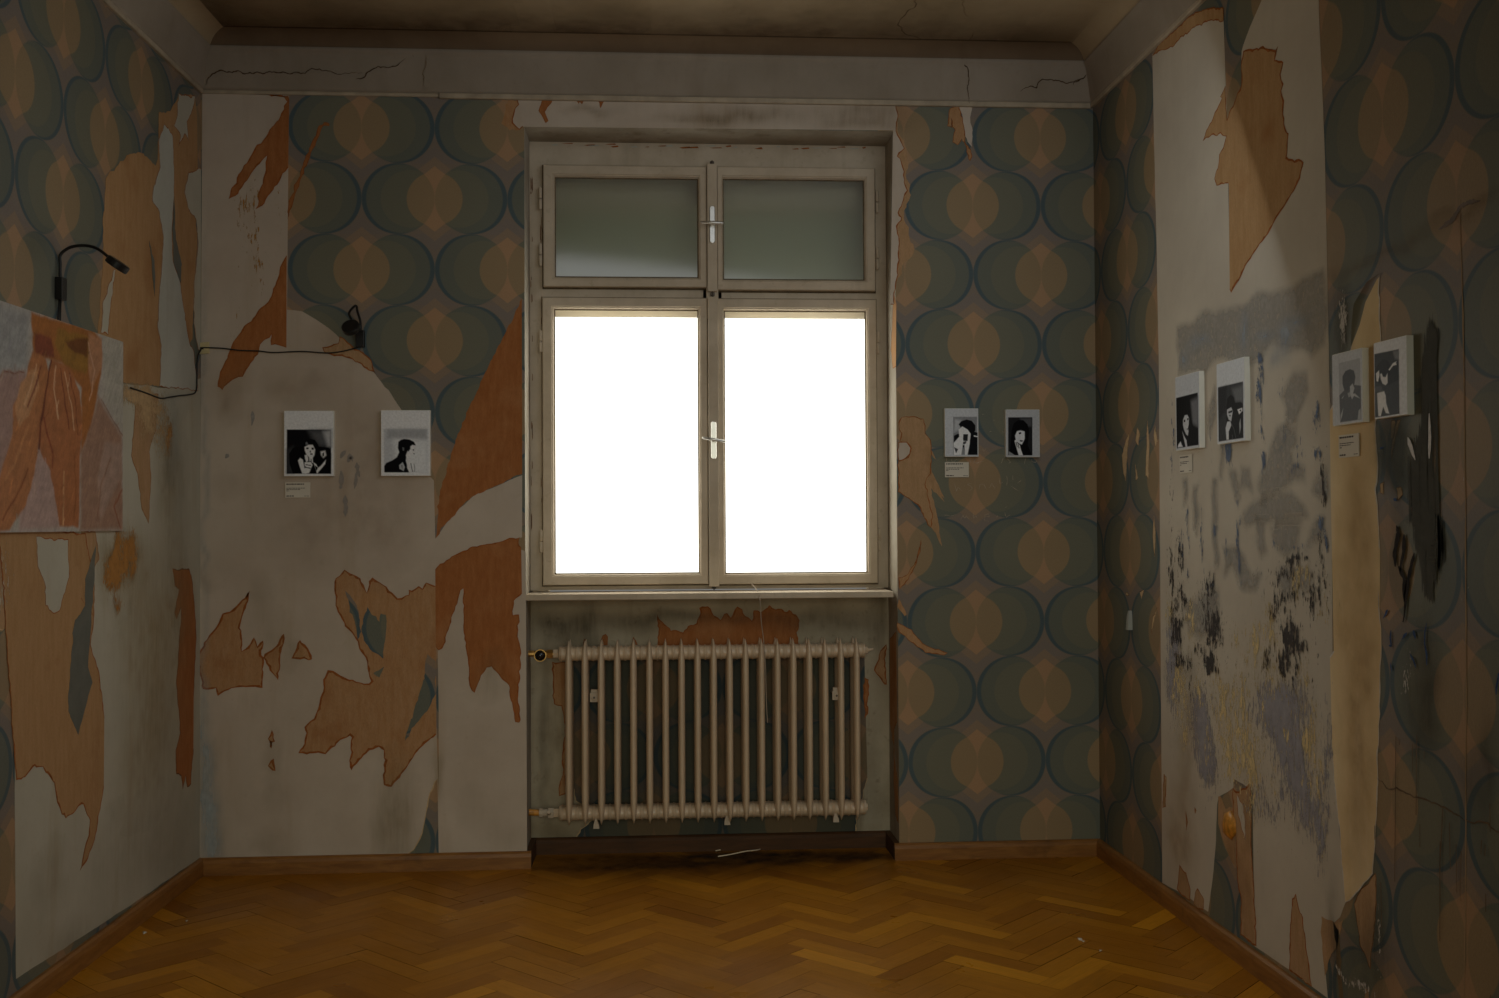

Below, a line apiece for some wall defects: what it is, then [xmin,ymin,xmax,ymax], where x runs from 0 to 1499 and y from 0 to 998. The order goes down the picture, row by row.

crack [1021,75,1086,91]
peeling [229,95,289,209]
peeling [1203,46,1304,292]
peeling [218,255,287,390]
peeling [200,591,312,695]
peeling [299,514,532,787]